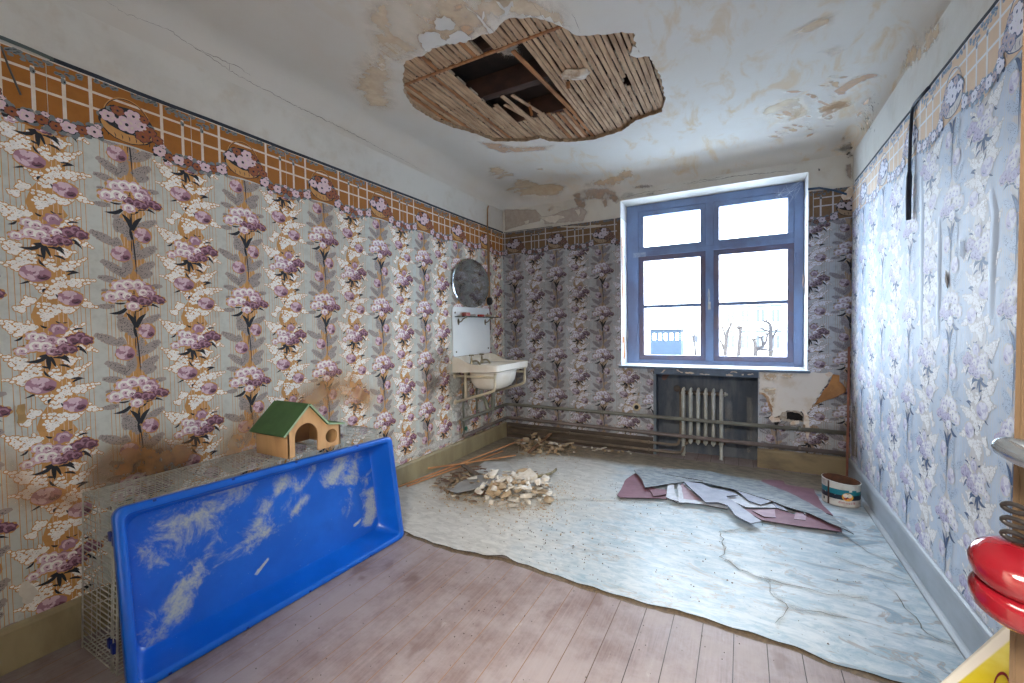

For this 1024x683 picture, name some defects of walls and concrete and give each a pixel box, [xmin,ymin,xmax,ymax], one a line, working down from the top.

peeling [418,16,471,51]
flaking render [505,210,541,230]
spalling [780,410,803,425]
water stain [94,443,195,481]